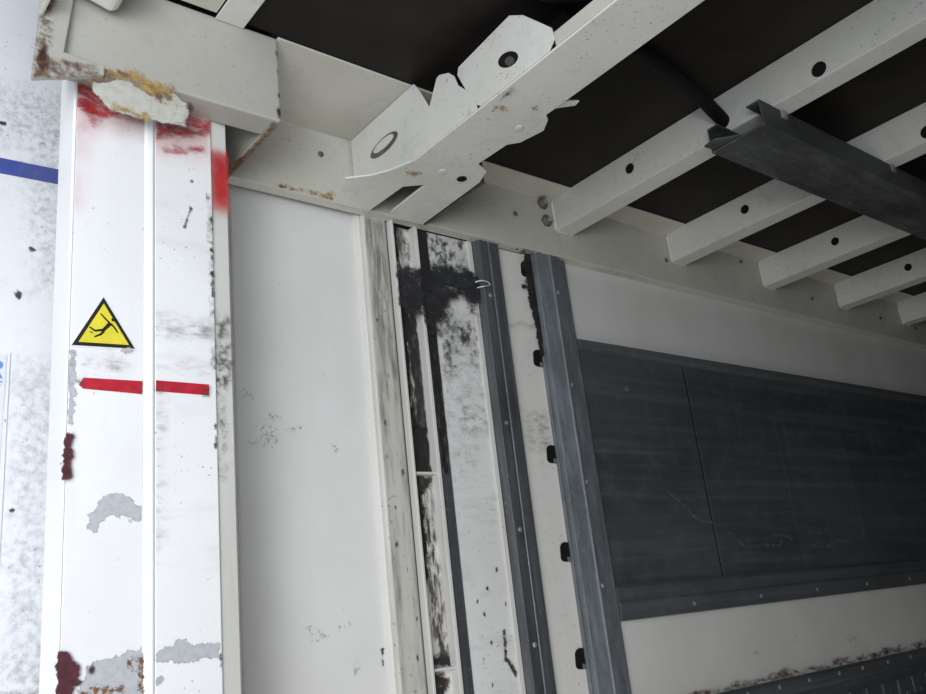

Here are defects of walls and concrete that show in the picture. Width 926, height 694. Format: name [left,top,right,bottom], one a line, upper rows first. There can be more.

corrosion [34,35,174,100]
peeling [91,79,193,127]
corrosion [227,93,281,178]
damp [393,228,481,367]
peeling [60,349,77,480]
damp [410,400,432,472]
peeling [87,493,142,533]
peeling [55,650,145,694]
peeling [156,639,222,663]